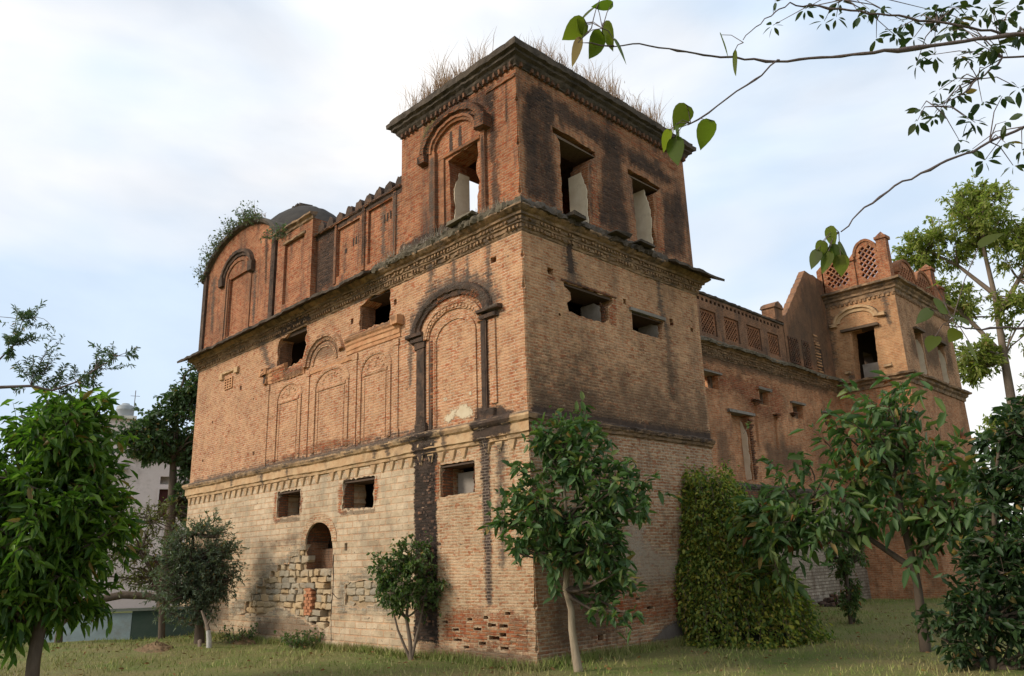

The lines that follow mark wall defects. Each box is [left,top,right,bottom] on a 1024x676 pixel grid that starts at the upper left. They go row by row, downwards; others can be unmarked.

flaking render [430,333,474,423]
damp [188,413,448,646]
spalling [441,606,530,652]